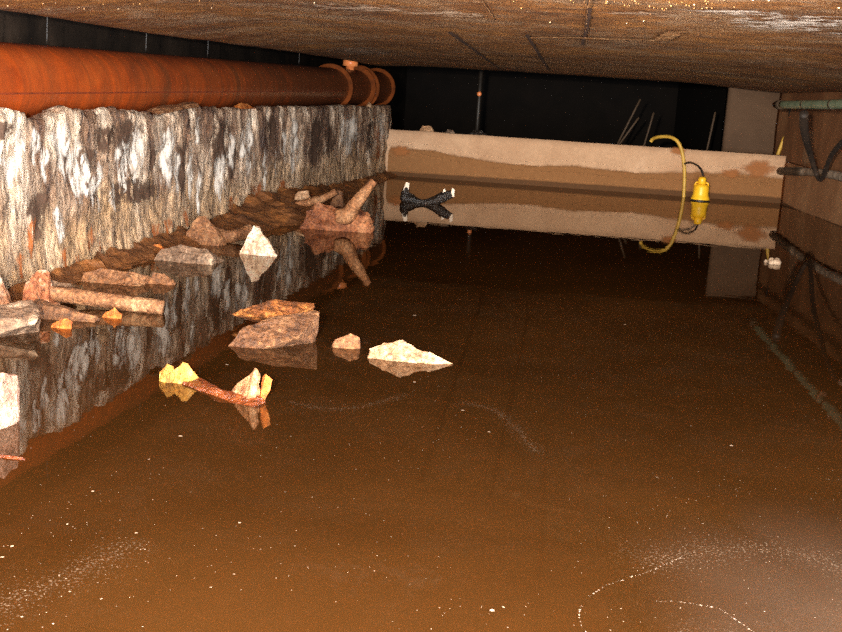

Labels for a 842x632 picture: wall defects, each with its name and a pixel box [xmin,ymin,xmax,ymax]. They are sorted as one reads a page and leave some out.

crack [525,0,686,71]
leakage [387,148,797,210]